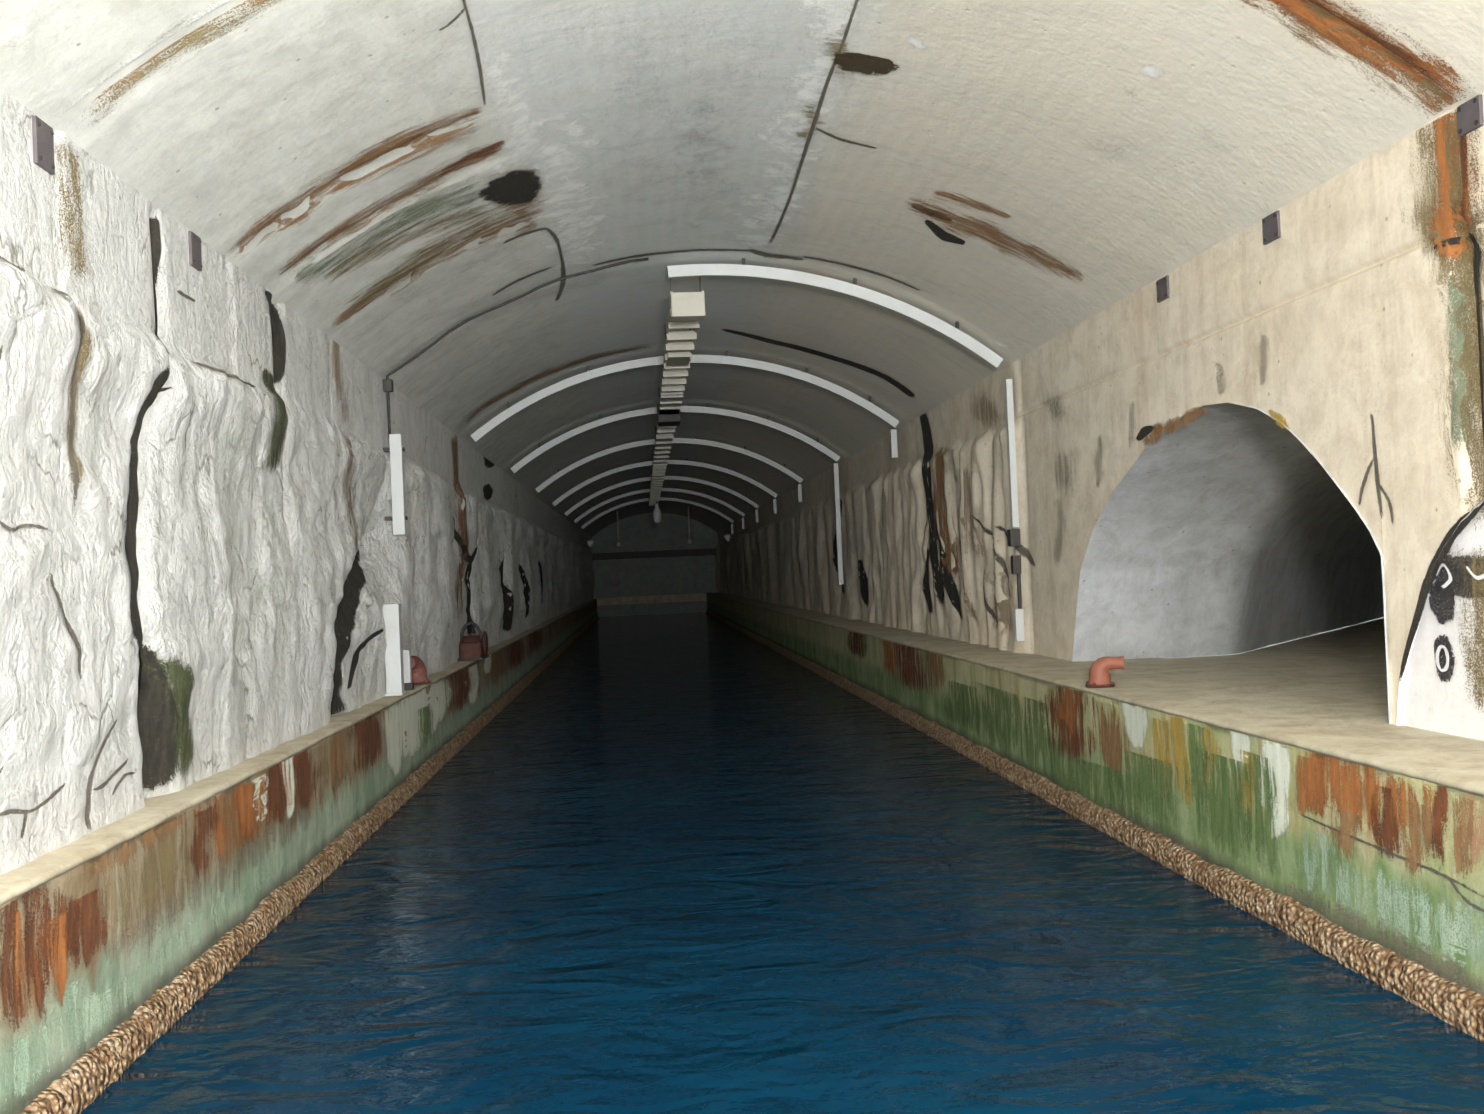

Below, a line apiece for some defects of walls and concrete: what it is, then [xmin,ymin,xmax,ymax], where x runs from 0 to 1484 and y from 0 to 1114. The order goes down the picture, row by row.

crack [439,0,486,104]
spalling [477,161,545,224]
leakage [228,0,867,549]
crack [492,0,919,300]
spalling [823,30,900,79]
corrosion [906,190,1084,282]
corrosion [1243,0,1484,265]
crack [721,329,1035,625]
leakage [1423,193,1484,710]
corrosion [185,714,387,875]
corrosion [1288,751,1484,887]
corrosion [0,885,110,1032]